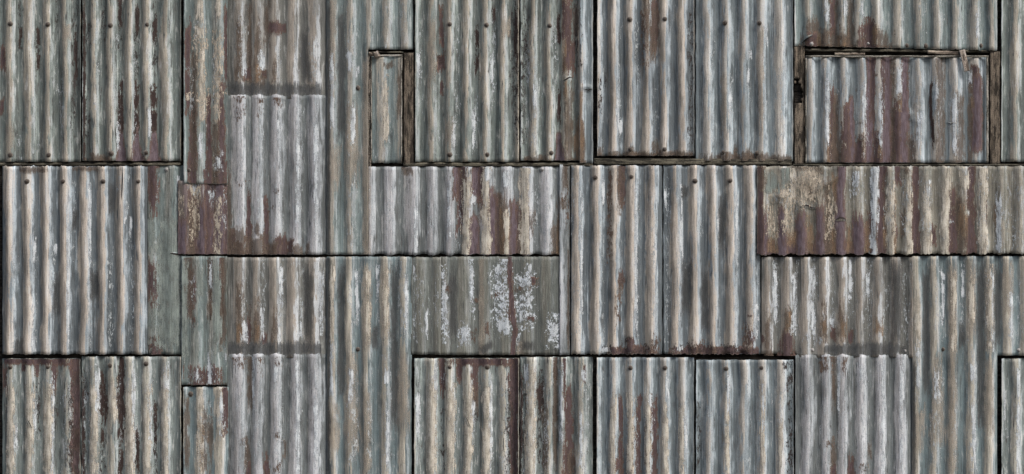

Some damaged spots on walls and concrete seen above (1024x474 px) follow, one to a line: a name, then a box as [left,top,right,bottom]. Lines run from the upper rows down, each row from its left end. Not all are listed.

corrosion [598,0,998,264]
corrosion [147,256,159,309]
corrosion [178,0,309,474]
peeling [235,167,584,474]
corrosion [452,167,536,255]
corrosion [614,267,626,328]
peeling [617,176,692,351]
corrosion [599,305,796,356]
corrosion [820,300,855,344]
corrosion [3,358,80,474]